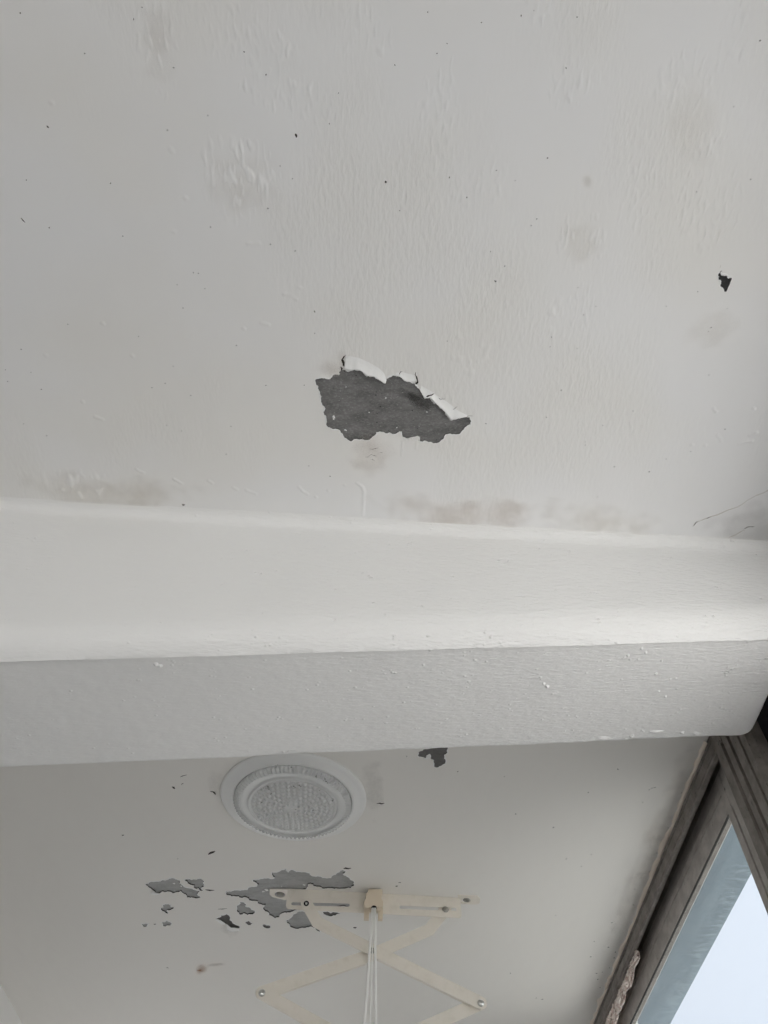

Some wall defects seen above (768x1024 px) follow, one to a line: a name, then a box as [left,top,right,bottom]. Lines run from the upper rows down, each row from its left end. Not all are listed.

peeling [717,271,733,293]
peeling [314,356,472,444]
peeling [417,748,448,768]
peeling [142,867,355,932]